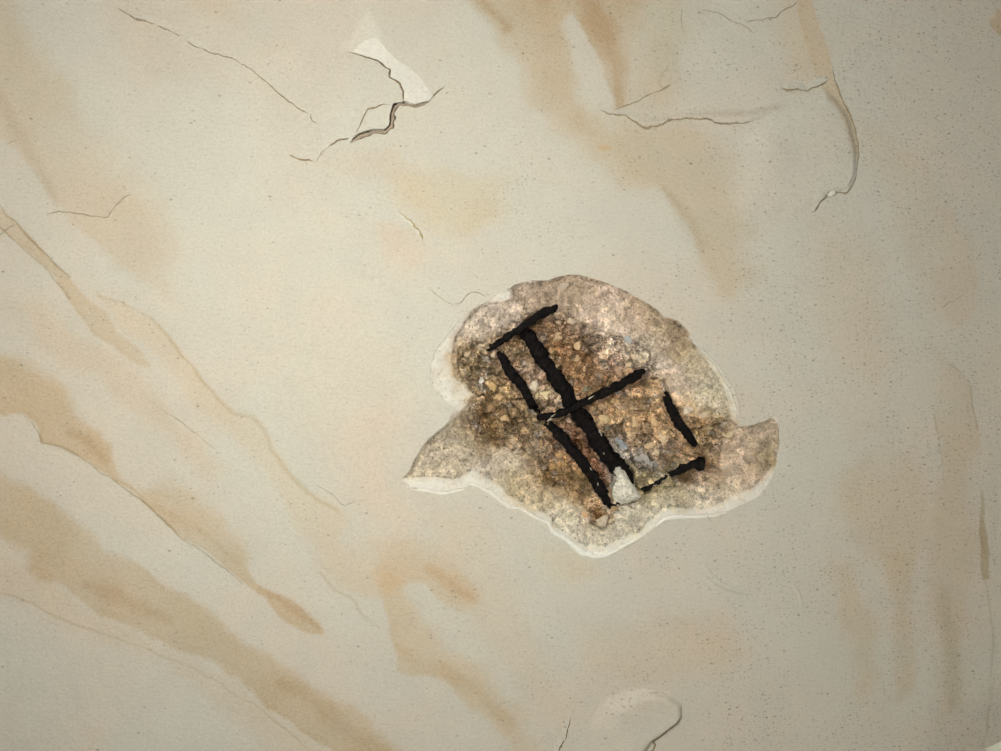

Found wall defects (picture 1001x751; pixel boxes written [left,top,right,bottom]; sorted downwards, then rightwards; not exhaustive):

crack [681,1,798,33]
crack [119,9,404,162]
flaking render [253,38,433,162]
crack [600,85,754,129]
crack [781,70,859,212]
damp [0,0,761,751]
rust [473,407,567,488]
rust [532,319,610,394]
rust [560,419,611,483]
spalling [401,275,780,559]
rust [665,453,717,486]
damp [461,0,1001,751]